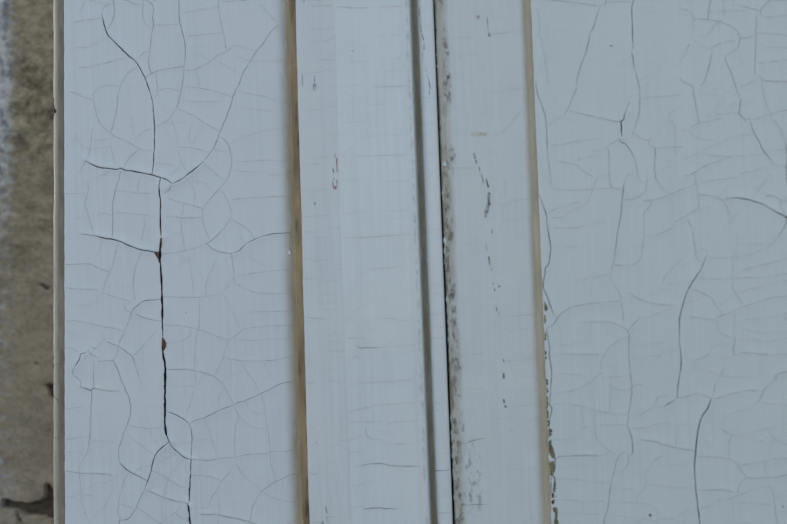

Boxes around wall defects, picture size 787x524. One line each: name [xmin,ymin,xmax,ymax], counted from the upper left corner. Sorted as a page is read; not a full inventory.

crack [53,0,324,524]
peeling [546,379,559,524]
crack [536,0,787,524]